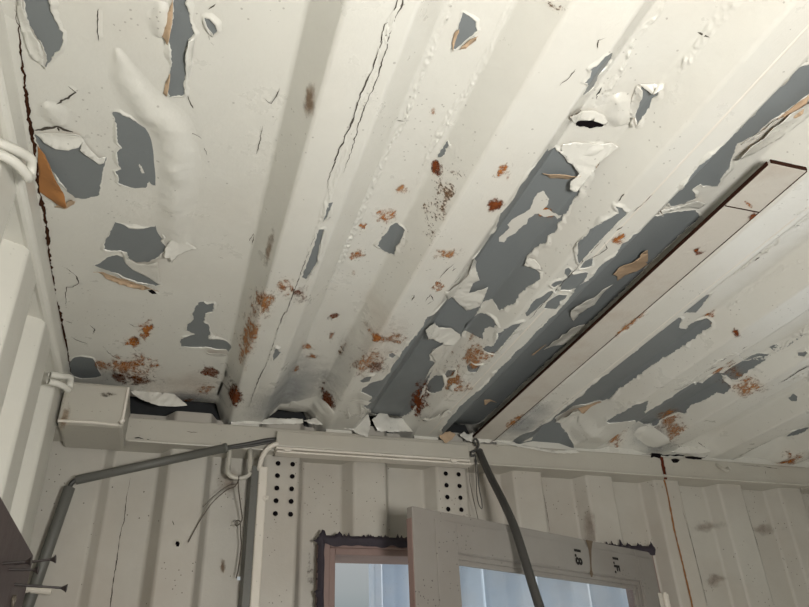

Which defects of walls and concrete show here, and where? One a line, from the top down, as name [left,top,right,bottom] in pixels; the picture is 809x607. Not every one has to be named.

crack [14,9,95,372]
peeling [33,109,156,209]
crack [96,9,104,42]
corrosion [95,319,159,386]
peeling [92,221,198,295]
peeling [162,0,222,99]
corrosion [239,280,307,364]
crack [249,237,315,407]
crack [328,0,404,193]
peeling [358,60,809,448]
corrosion [472,159,807,441]
corrosion [660,457,693,607]